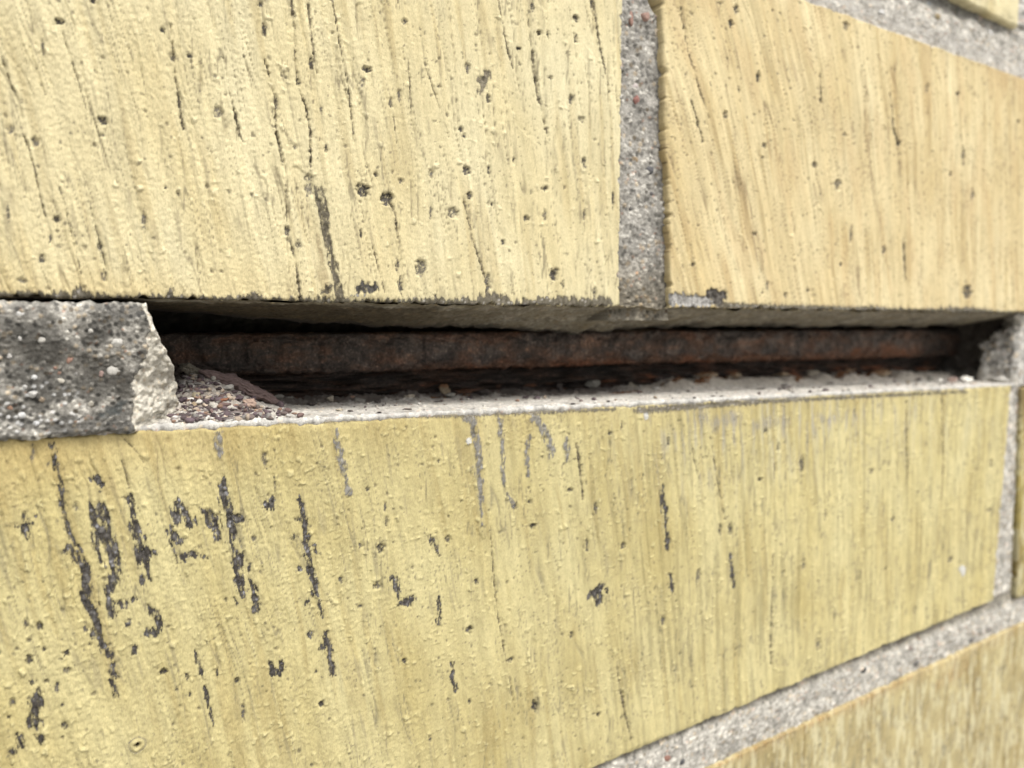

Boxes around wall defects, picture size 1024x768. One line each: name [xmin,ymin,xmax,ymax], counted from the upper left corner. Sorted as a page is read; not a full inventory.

spalling [131,303,179,432]